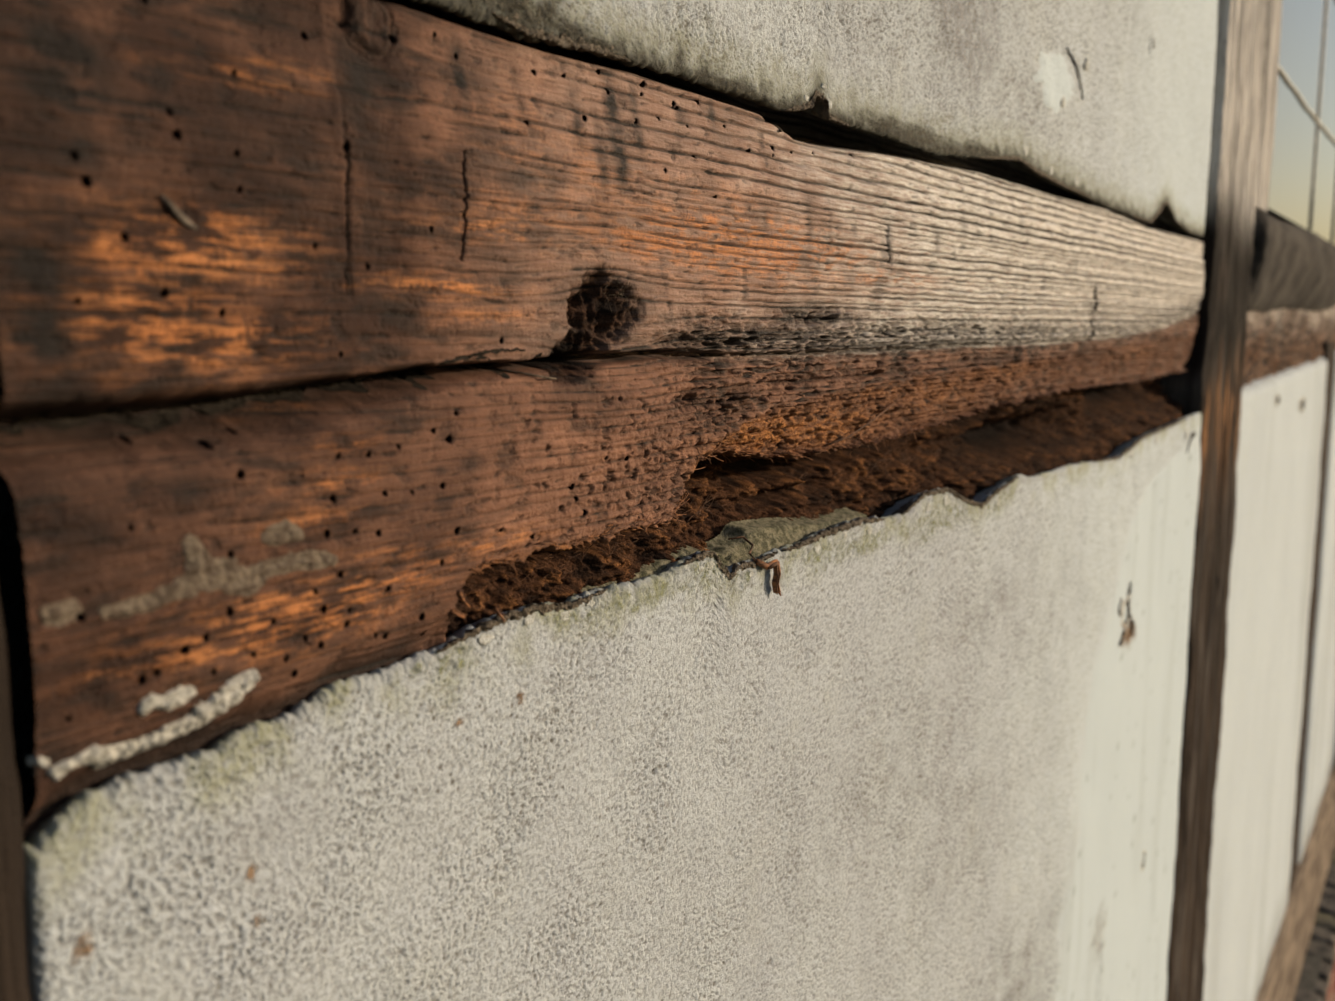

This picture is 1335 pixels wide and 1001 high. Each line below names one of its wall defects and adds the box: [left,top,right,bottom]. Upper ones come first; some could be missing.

peeling [1033,47,1089,115]
spalling [681,476,1019,580]
spalling [1118,581,1136,646]